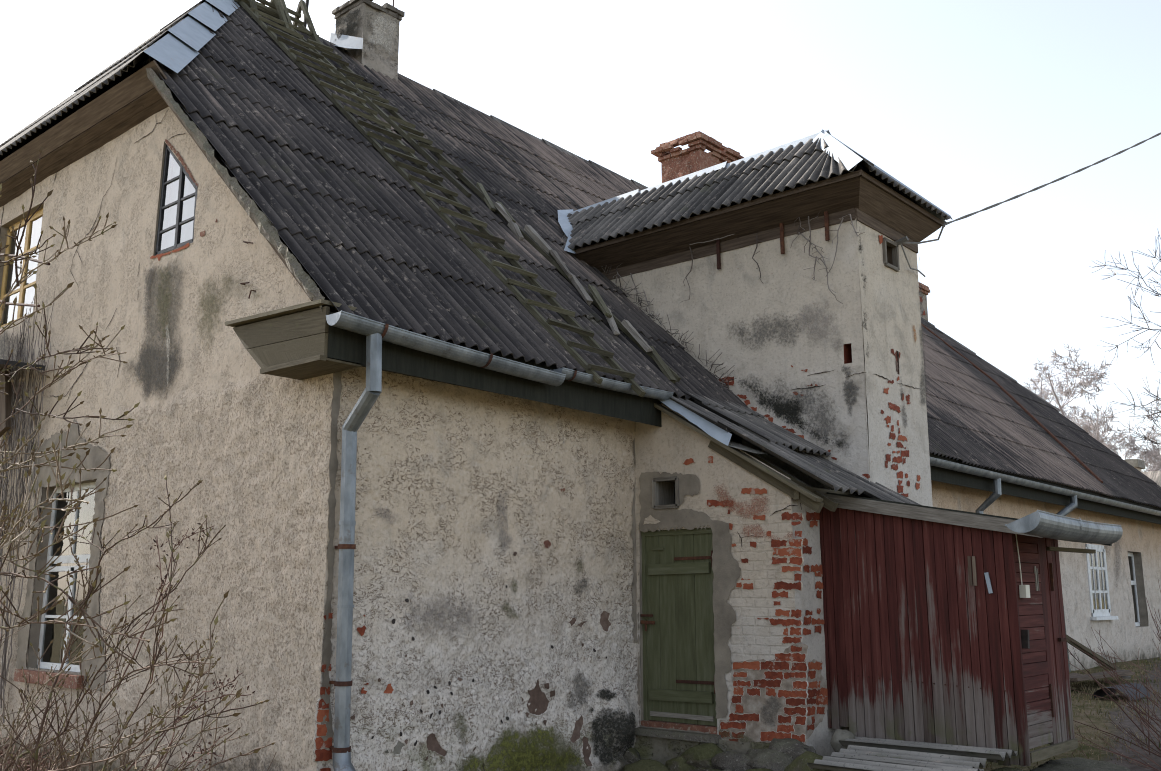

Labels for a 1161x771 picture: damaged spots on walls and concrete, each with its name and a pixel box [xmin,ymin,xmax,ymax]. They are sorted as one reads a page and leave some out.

leakage [137,266,181,393]
leakage [742,380,847,447]
leakage [843,367,858,414]
spalling [881,349,921,497]
spalling [707,486,828,743]
spalling [313,687,333,771]
spalling [501,677,555,726]
spalling [569,713,594,769]
leakage [571,674,636,764]